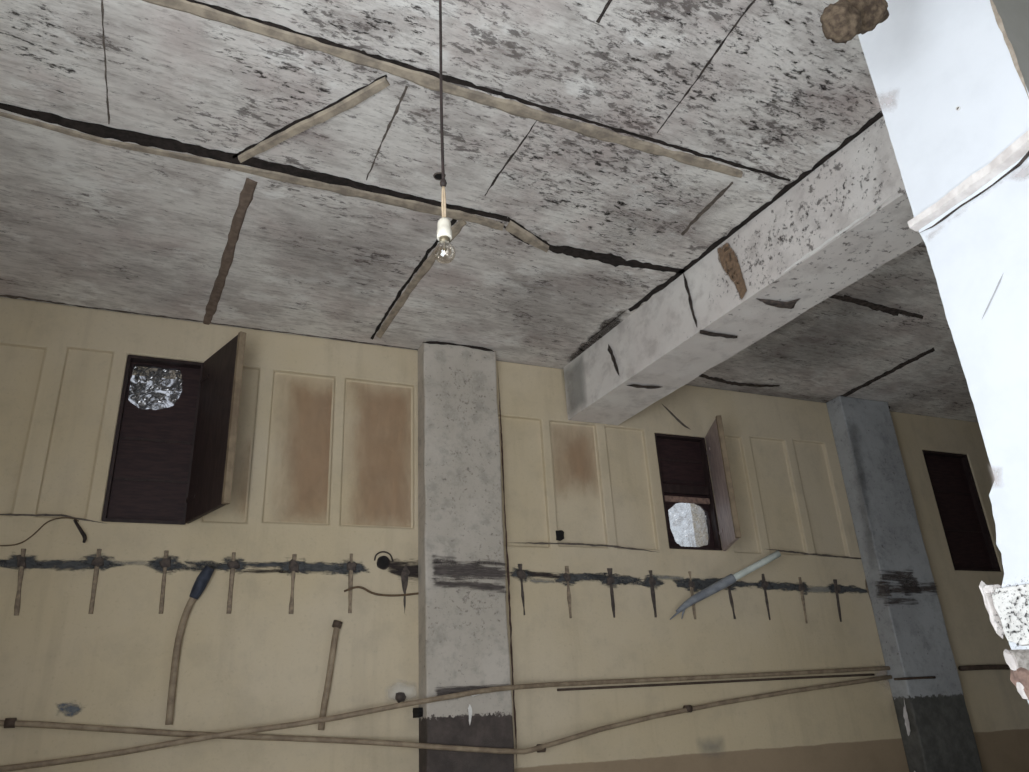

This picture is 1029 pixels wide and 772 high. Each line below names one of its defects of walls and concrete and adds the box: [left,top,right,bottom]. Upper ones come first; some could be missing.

crack [596,0,612,23]
crack [683,272,738,339]
crack [608,344,691,430]
crack [0,295,655,762]
peeling [979,580,1029,700]